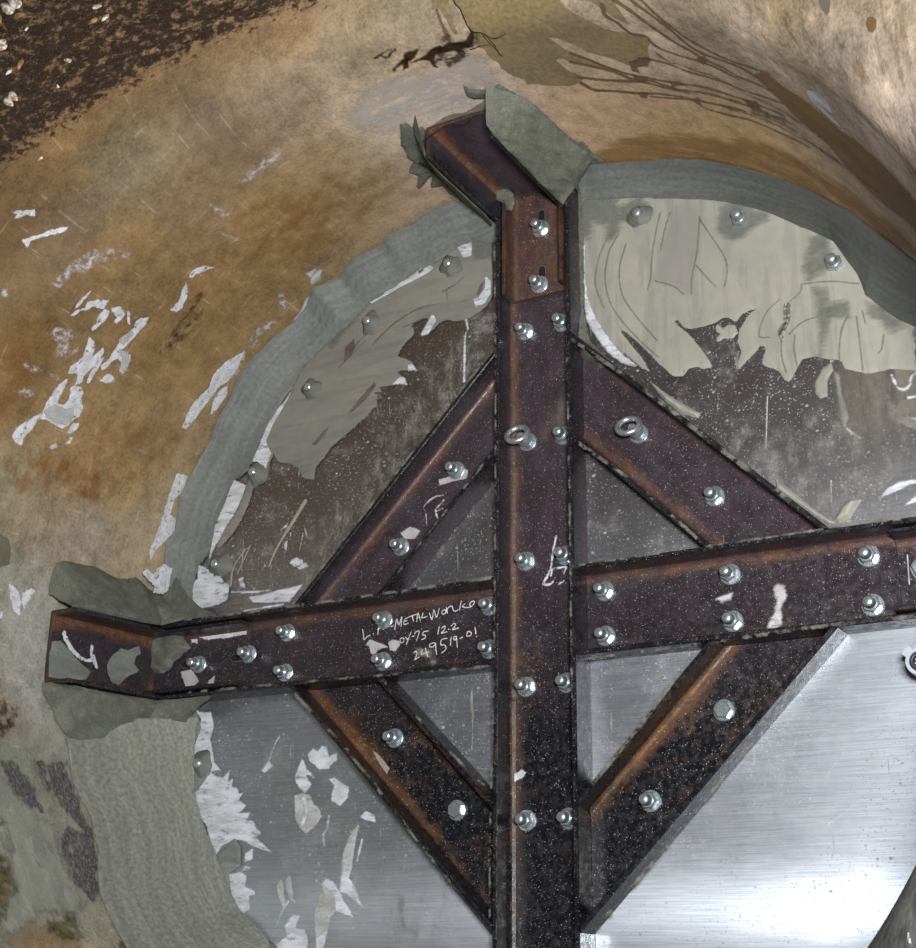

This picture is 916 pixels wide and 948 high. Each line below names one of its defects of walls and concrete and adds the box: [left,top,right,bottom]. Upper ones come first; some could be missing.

crack [453,0,503,57]
rust [600,137,916,253]
peeling [91,306,130,331]
peeling [12,357,115,449]
peeling [211,384,228,415]